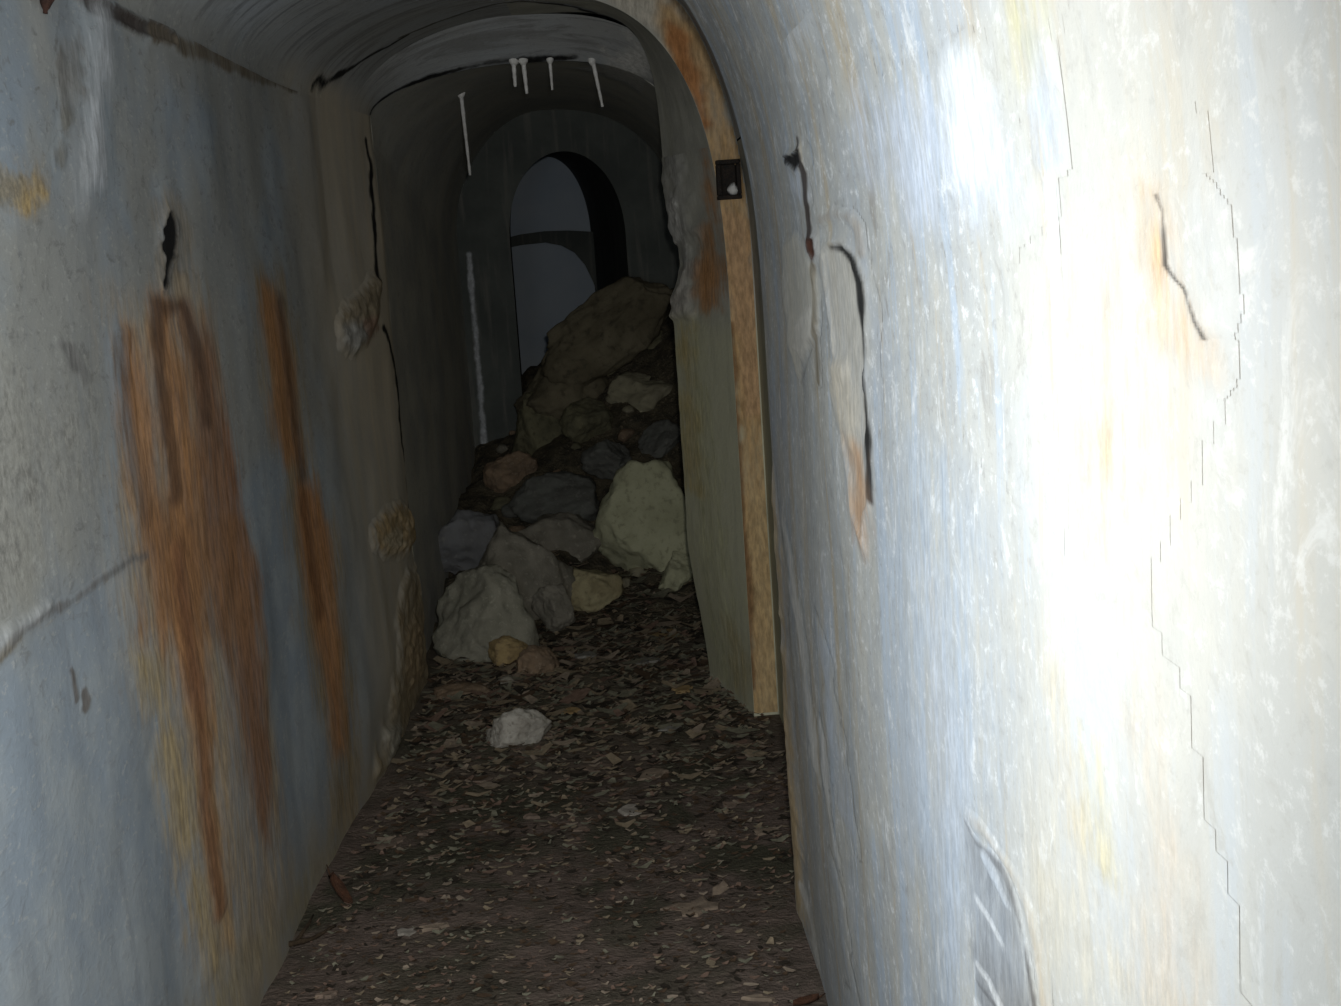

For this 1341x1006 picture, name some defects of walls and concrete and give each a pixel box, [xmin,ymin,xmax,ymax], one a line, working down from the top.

crack [25,0,638,100]
crack [363,53,580,508]
spalling [661,151,702,324]
crack [795,132,823,389]
spalling [780,165,886,574]
crack [0,553,140,670]
rust [71,239,367,1006]